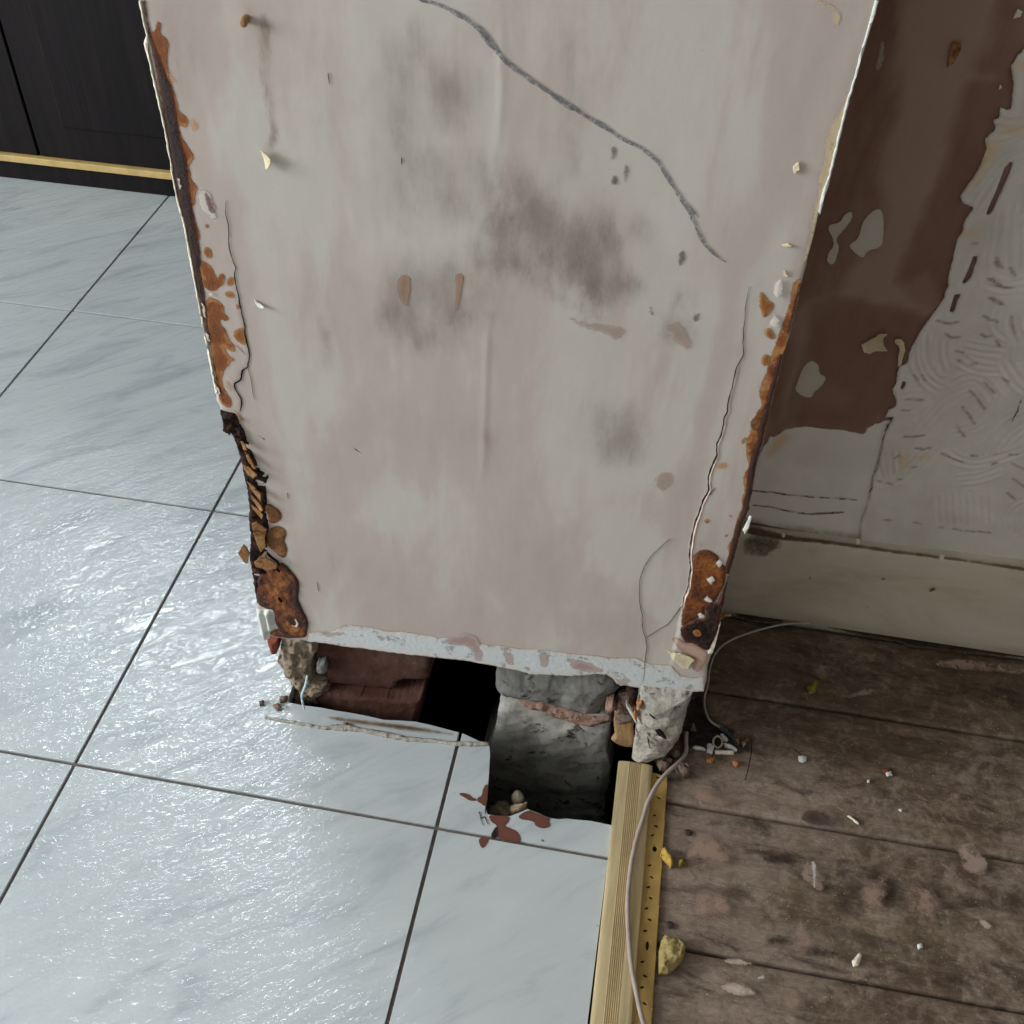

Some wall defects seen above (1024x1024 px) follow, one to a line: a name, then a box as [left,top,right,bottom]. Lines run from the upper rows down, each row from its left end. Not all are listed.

rust [143,0,246,420]
crack [225,205,254,411]
rust [238,441,308,638]
spalling [397,275,410,306]
crack [639,289,749,680]
flaking render [698,559,722,618]
rust [680,279,802,650]
peeling [795,361,826,398]
peeling [803,0,879,261]
peeling [827,209,884,265]
peeling [861,333,905,367]
spalling [267,622,721,848]